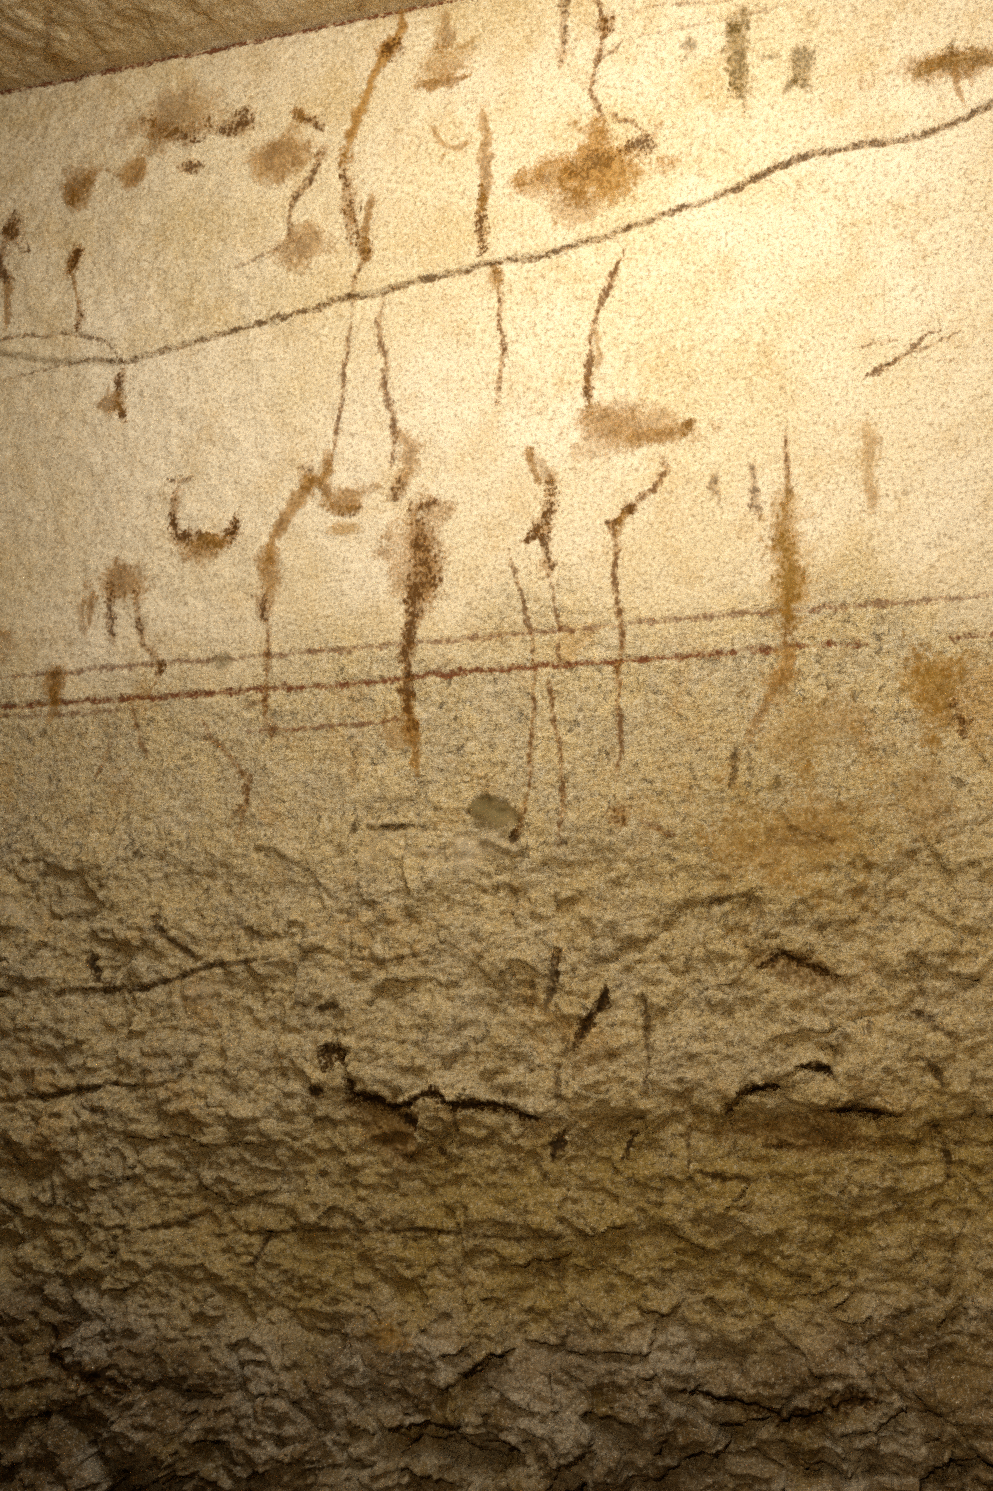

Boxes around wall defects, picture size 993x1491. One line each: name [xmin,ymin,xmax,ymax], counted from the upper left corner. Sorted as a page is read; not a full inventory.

crack [0,100,993,402]
damp [633,418,696,440]
crack [130,701,148,756]
crack [544,950,652,1094]
crack [911,1009,957,1038]
crack [550,1129,568,1162]
crack [928,1124,954,1186]
crack [248,1234,272,1270]
crack [44,1313,137,1394]
crack [683,1387,884,1434]
crack [132,1472,221,1491]